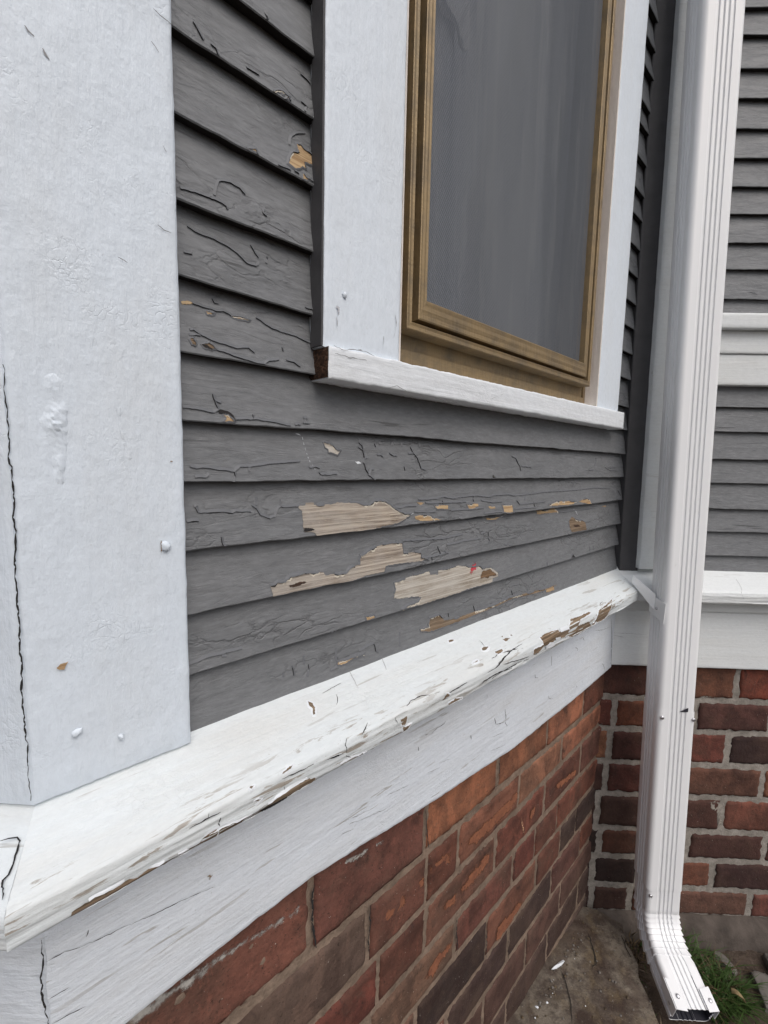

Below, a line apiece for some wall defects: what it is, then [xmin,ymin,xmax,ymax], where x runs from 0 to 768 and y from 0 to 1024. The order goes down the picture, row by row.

peeling [286,142,314,183]
crack [180,178,267,216]
crack [158,224,268,266]
crack [189,298,397,367]
peeling [298,498,449,536]
peeling [537,498,607,533]
crack [2,364,31,801]
peeling [269,540,556,644]
peeling [532,597,614,656]
crack [1,837,21,900]
peeling [69,763,317,918]
crack [40,887,213,1024]